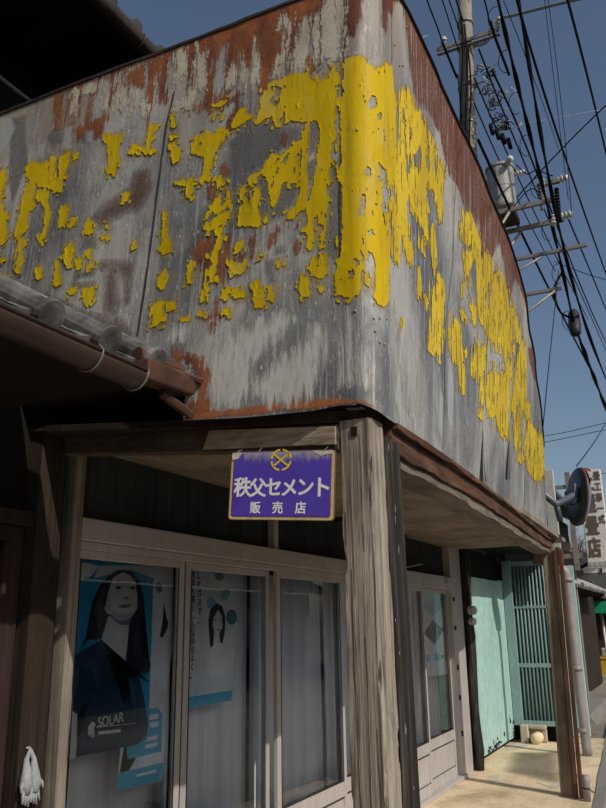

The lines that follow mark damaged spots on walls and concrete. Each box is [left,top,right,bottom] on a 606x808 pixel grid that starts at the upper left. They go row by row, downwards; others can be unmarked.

corrosion [51,0,362,141]
peeling [32,265,43,281]
peeling [0,148,111,278]
peeling [53,242,99,308]
peeling [68,0,545,486]
corrosion [171,345,374,419]